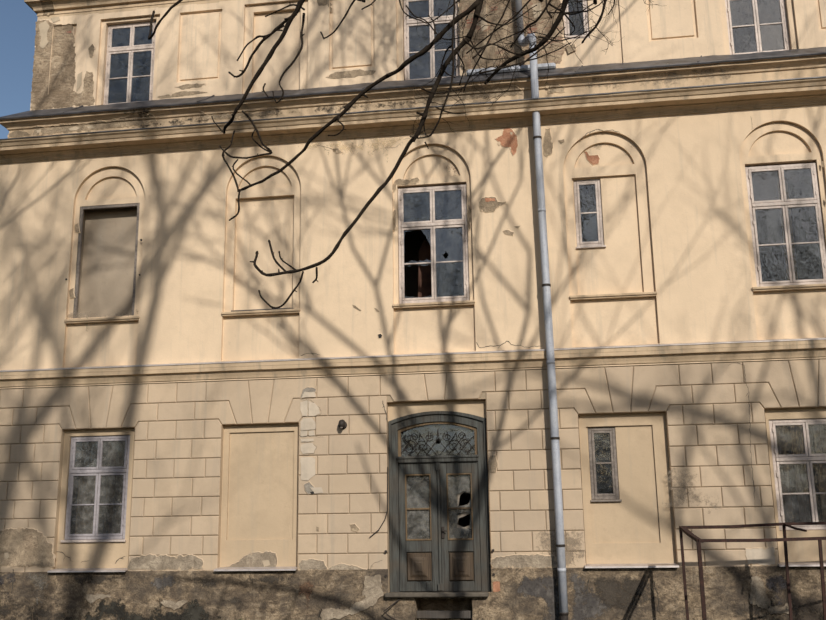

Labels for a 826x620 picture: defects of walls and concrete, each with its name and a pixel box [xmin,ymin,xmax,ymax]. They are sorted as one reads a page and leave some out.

spalling [30,0,95,110]
peeling [327,69,375,79]
spalling [459,0,577,72]
spalling [467,196,508,231]
peeling [299,385,323,495]
water stain [0,593,72,620]
water stain [74,574,117,585]
water stain [84,598,221,620]
spalling [127,553,204,571]
peeling [298,558,385,620]
water stain [517,576,560,620]
water stain [569,573,655,620]